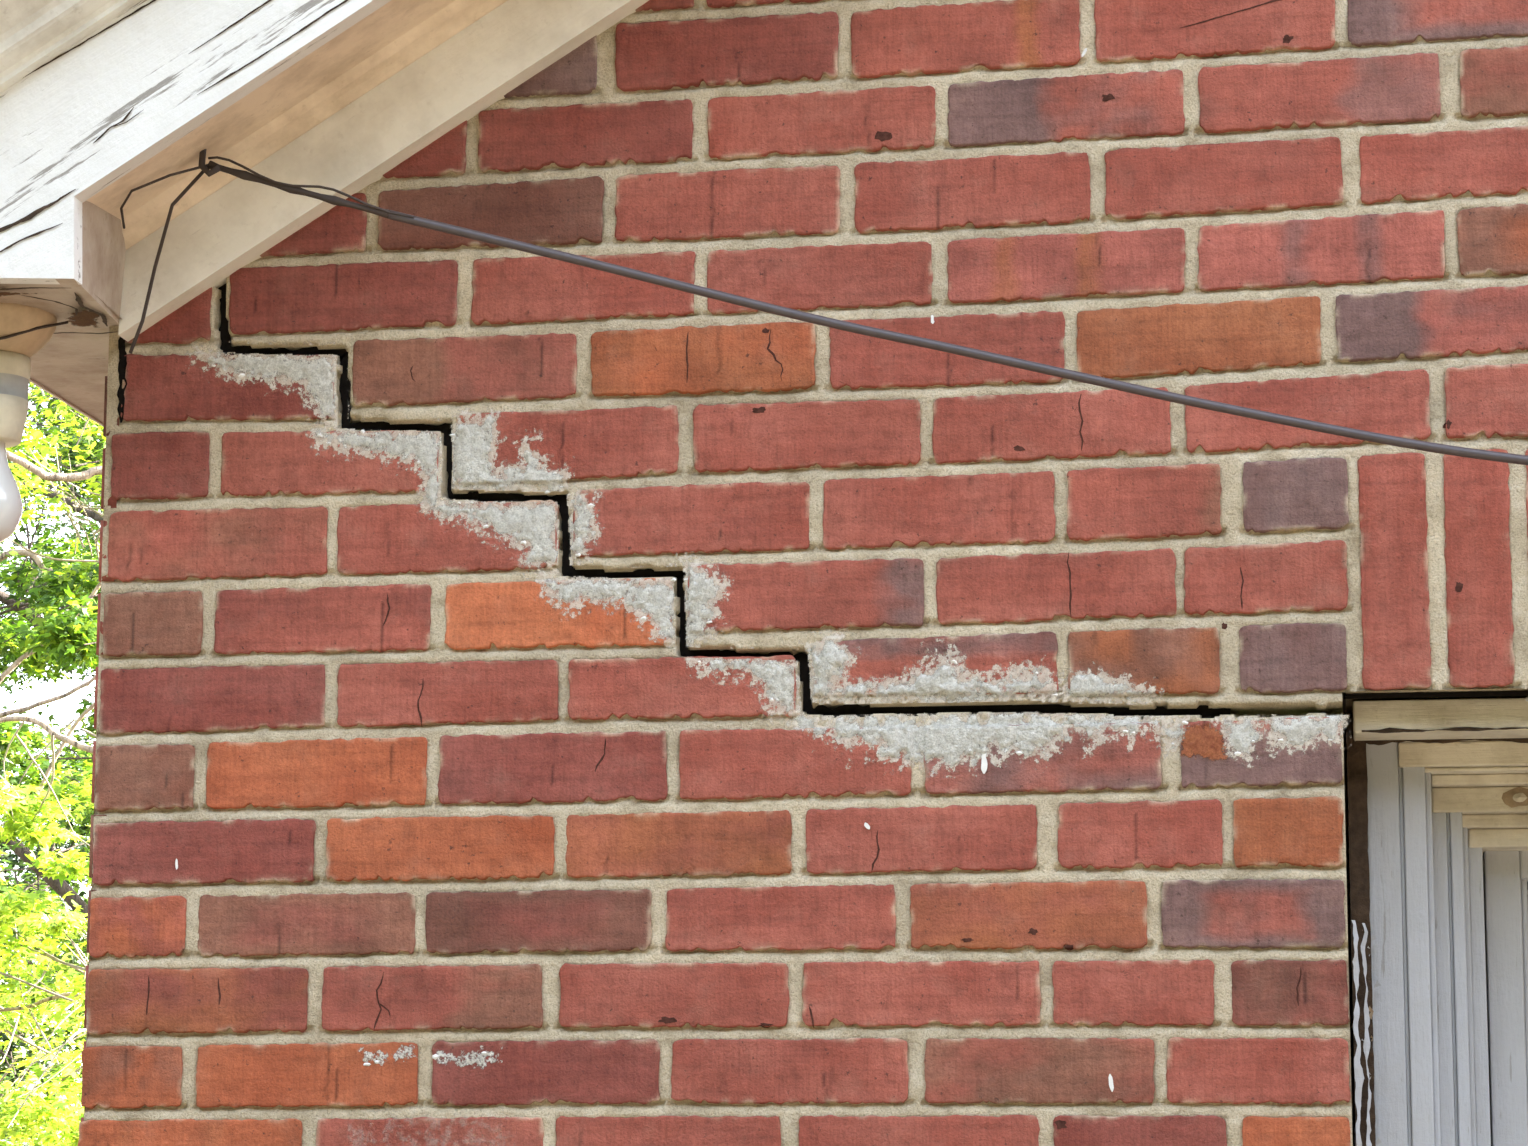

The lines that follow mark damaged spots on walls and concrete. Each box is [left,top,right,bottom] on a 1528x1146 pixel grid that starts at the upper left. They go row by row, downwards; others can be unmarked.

crack [416,681,424,726]
crack [218,283,1231,718]
crack [1238,567,1246,608]
peeling [1328,712,1382,1146]